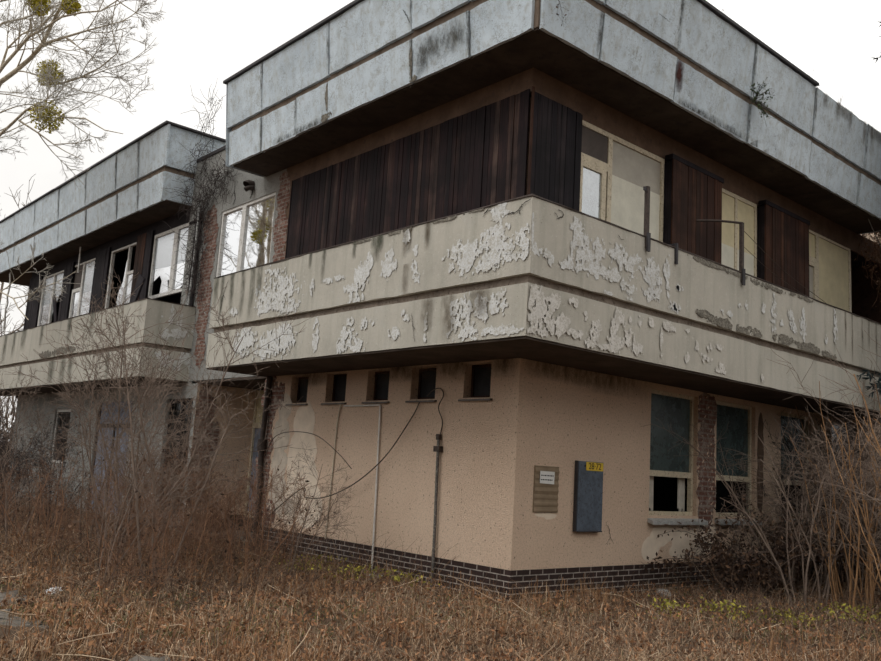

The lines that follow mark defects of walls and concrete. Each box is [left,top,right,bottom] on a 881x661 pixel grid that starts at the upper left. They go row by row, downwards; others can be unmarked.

damp [410,17,469,66]
peeling [233,171,397,361]
peeling [438,202,731,375]